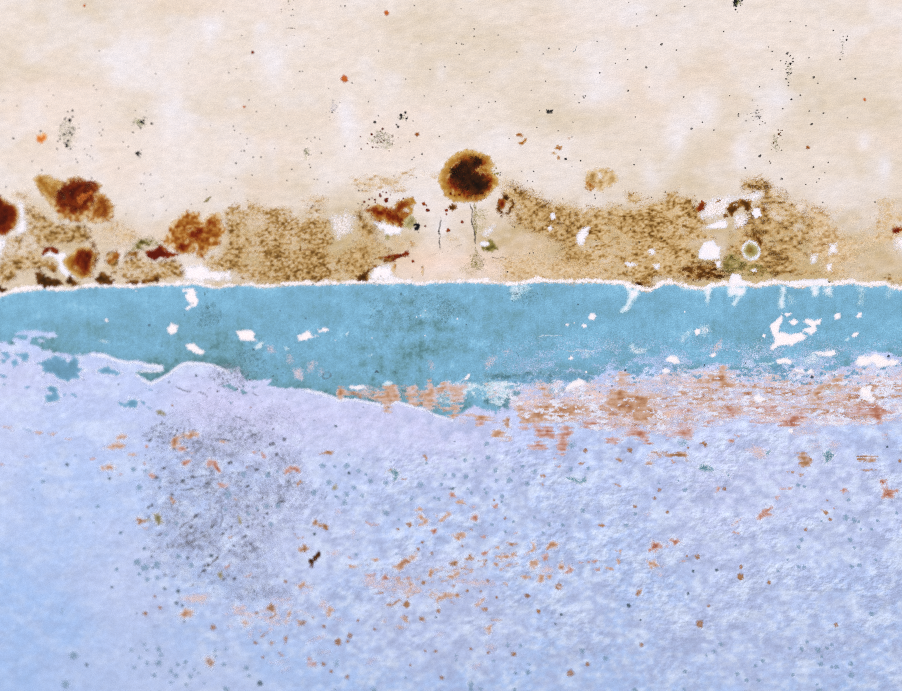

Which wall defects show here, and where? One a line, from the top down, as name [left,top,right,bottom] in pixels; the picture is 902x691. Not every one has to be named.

corrosion [0,195,20,237]
corrosion [32,174,116,224]
water stain [0,188,185,286]
corrosion [34,209,227,289]
water stain [204,168,439,285]
corrosion [363,191,430,240]
corrosion [437,149,518,218]
water stain [460,174,902,305]
peeling [0,339,257,406]
peeling [167,428,237,500]
peeling [236,312,902,663]
peeling [225,579,352,673]